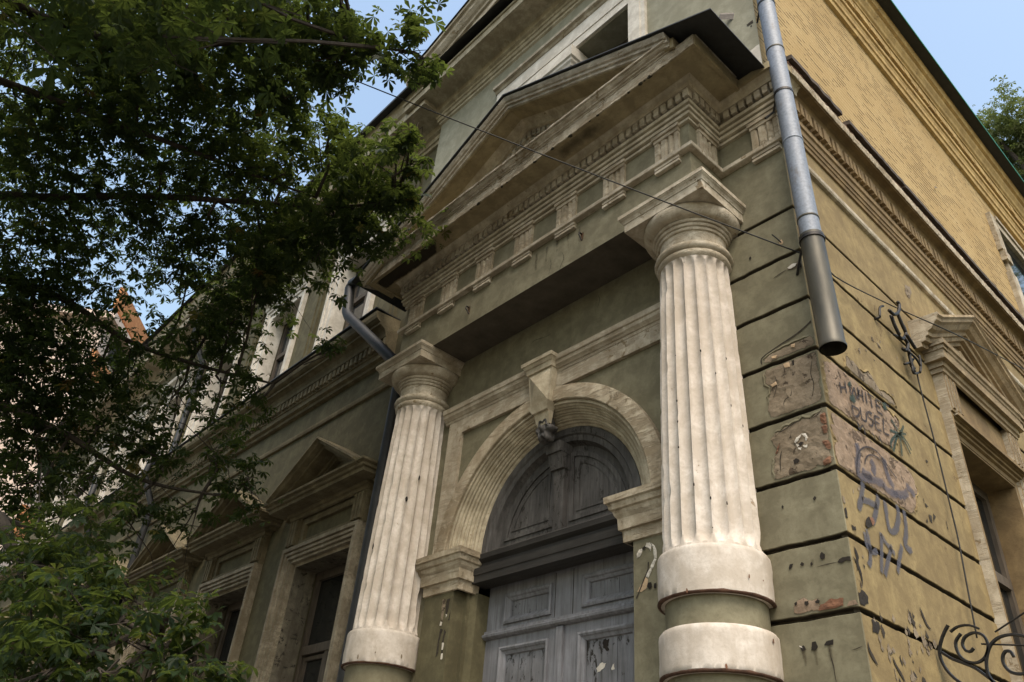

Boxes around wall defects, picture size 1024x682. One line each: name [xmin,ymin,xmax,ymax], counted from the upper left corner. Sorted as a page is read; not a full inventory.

spalling [760,320,948,530]
peeling [436,598,450,659]
spalling [794,597,858,614]
peeling [874,610,937,682]